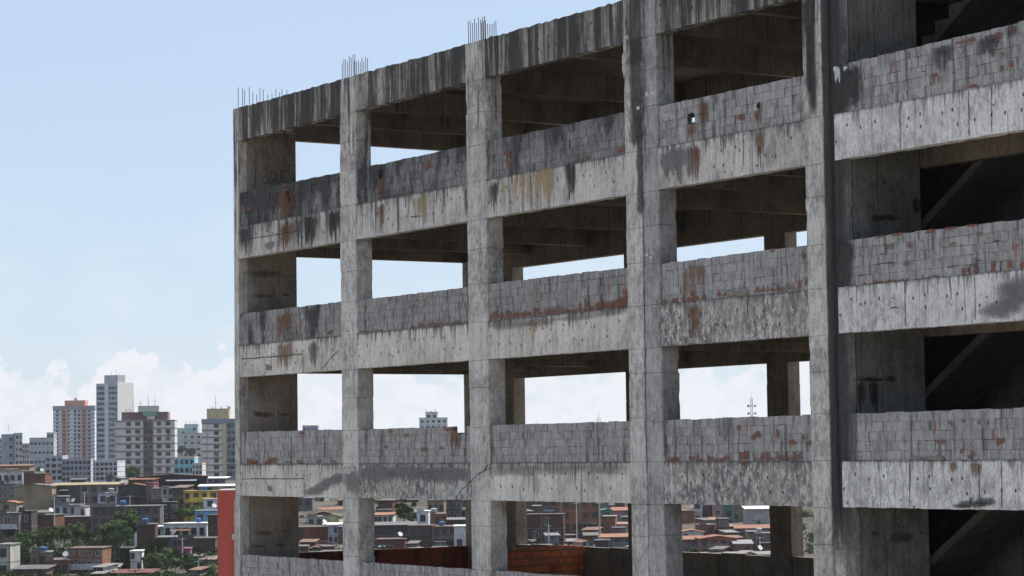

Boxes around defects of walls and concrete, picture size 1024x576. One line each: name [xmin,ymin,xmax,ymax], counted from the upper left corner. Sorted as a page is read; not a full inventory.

damp [626,0,654,214]
damp [661,148,691,184]
corrosion [688,102,708,175]
damp [802,0,895,540]
damp [986,278,1024,317]
corrosion [278,312,291,367]
crack [434,464,489,499]
damp [953,498,994,508]